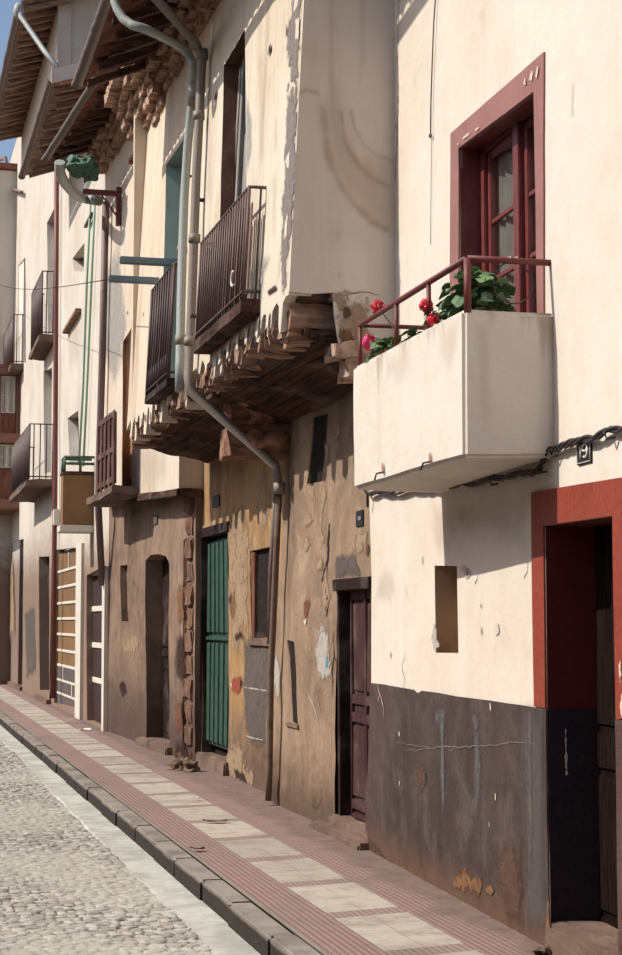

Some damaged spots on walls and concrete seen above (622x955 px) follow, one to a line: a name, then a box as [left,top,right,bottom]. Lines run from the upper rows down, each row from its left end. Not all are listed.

peeling [267,0,301,295]
flaking render [231,676,242,694]
crack [396,741,533,751]
spalling [453,868,494,896]